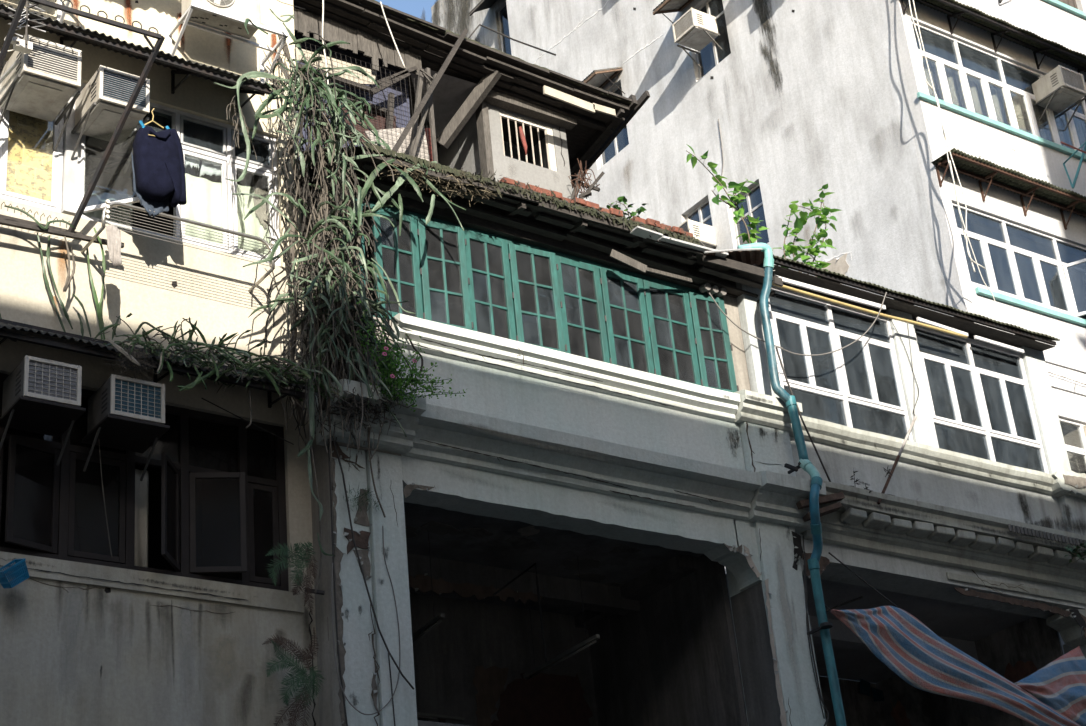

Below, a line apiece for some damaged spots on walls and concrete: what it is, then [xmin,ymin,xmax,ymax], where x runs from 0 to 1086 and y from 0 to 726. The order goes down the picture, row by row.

water stain [753,0,781,87]
peeling [822,253,849,284]
peeling [332,441,372,726]
peeling [723,543,788,726]
spalling [954,587,1086,639]
peeling [1004,660,1037,683]